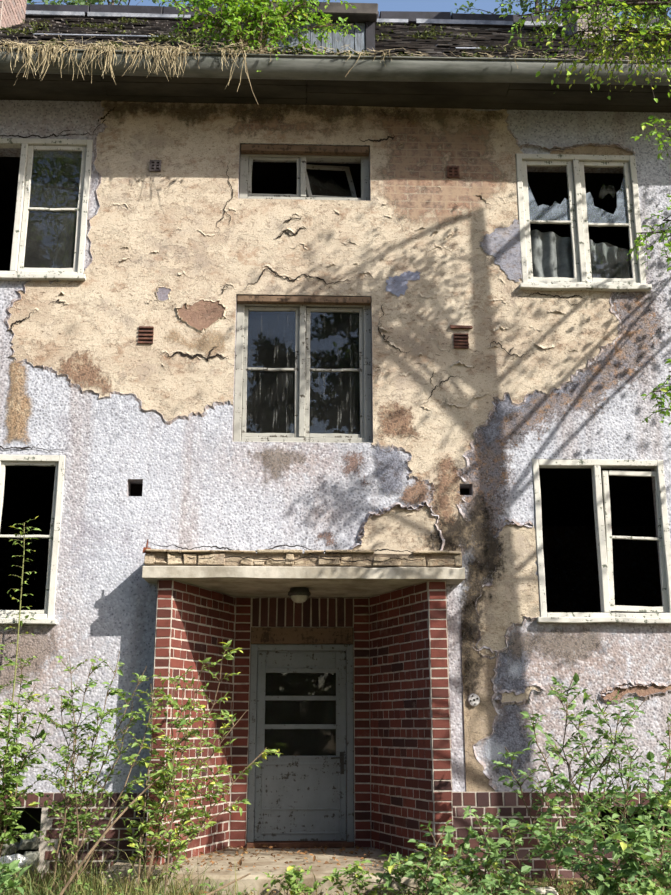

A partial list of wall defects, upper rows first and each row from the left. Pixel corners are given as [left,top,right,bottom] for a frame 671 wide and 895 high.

crack [0,111,111,138]
crack [216,161,233,232]
crack [273,218,308,240]
crack [219,268,357,295]
peeling [3,100,636,556]
crack [378,306,411,354]
crack [424,372,463,403]
crack [0,444,67,452]
leakage [341,291,670,698]
crack [141,542,449,563]
peeling [462,516,546,792]
spalling [597,679,671,705]